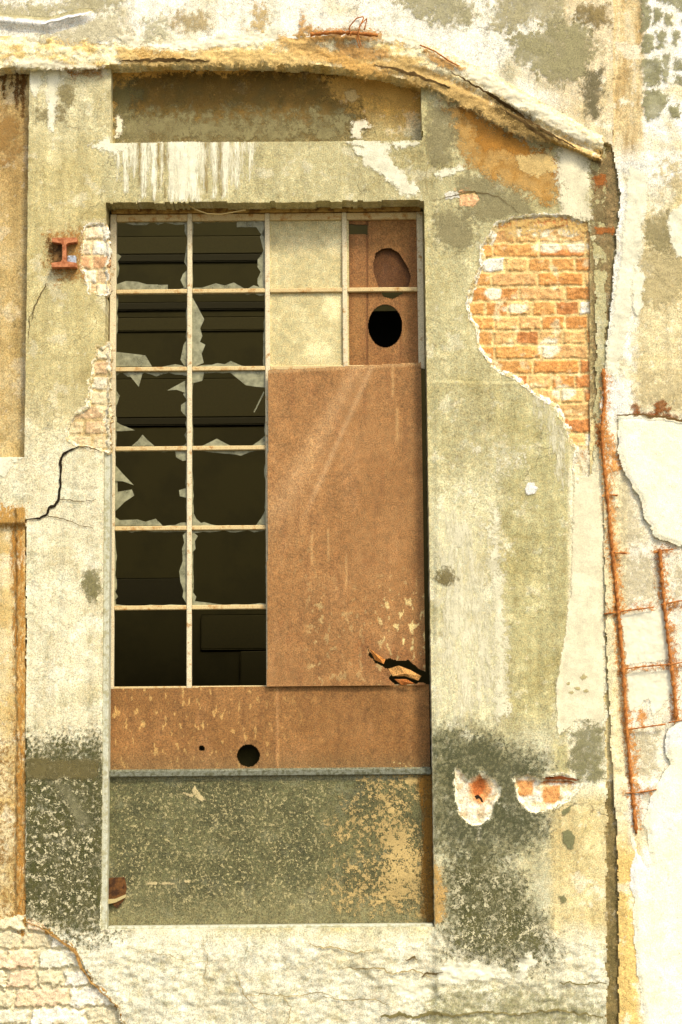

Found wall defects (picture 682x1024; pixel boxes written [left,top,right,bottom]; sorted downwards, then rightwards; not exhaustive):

rust [296,14,395,61]
rust [419,44,467,71]
rust [40,224,86,286]
spalling [78,222,113,299]
water stain [0,68,682,423]
spalling [64,341,115,455]
crack [25,446,100,528]
spalling [452,212,682,1024]
rust [595,374,682,830]
water stain [390,395,619,1024]
water stain [24,723,132,954]
spalling [0,915,126,1024]